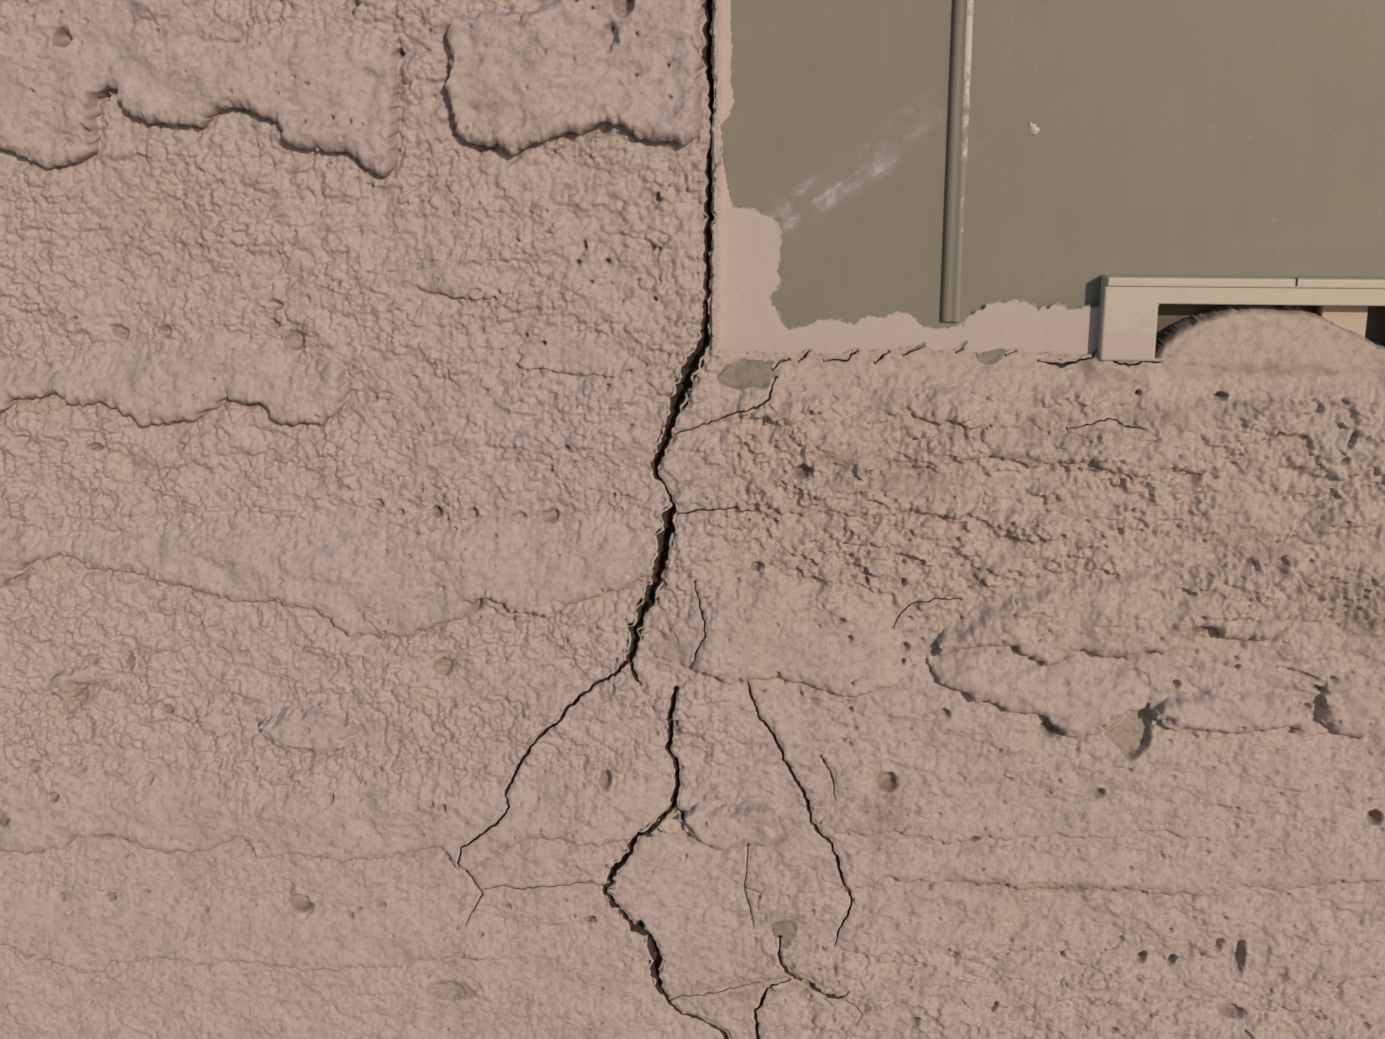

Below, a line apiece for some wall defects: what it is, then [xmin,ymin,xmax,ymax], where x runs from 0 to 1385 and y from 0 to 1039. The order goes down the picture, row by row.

peeling [974,349,1006,365]
crack [1005,346,1162,371]
crack [1067,415,1146,433]
crack [455,0,968,1039]